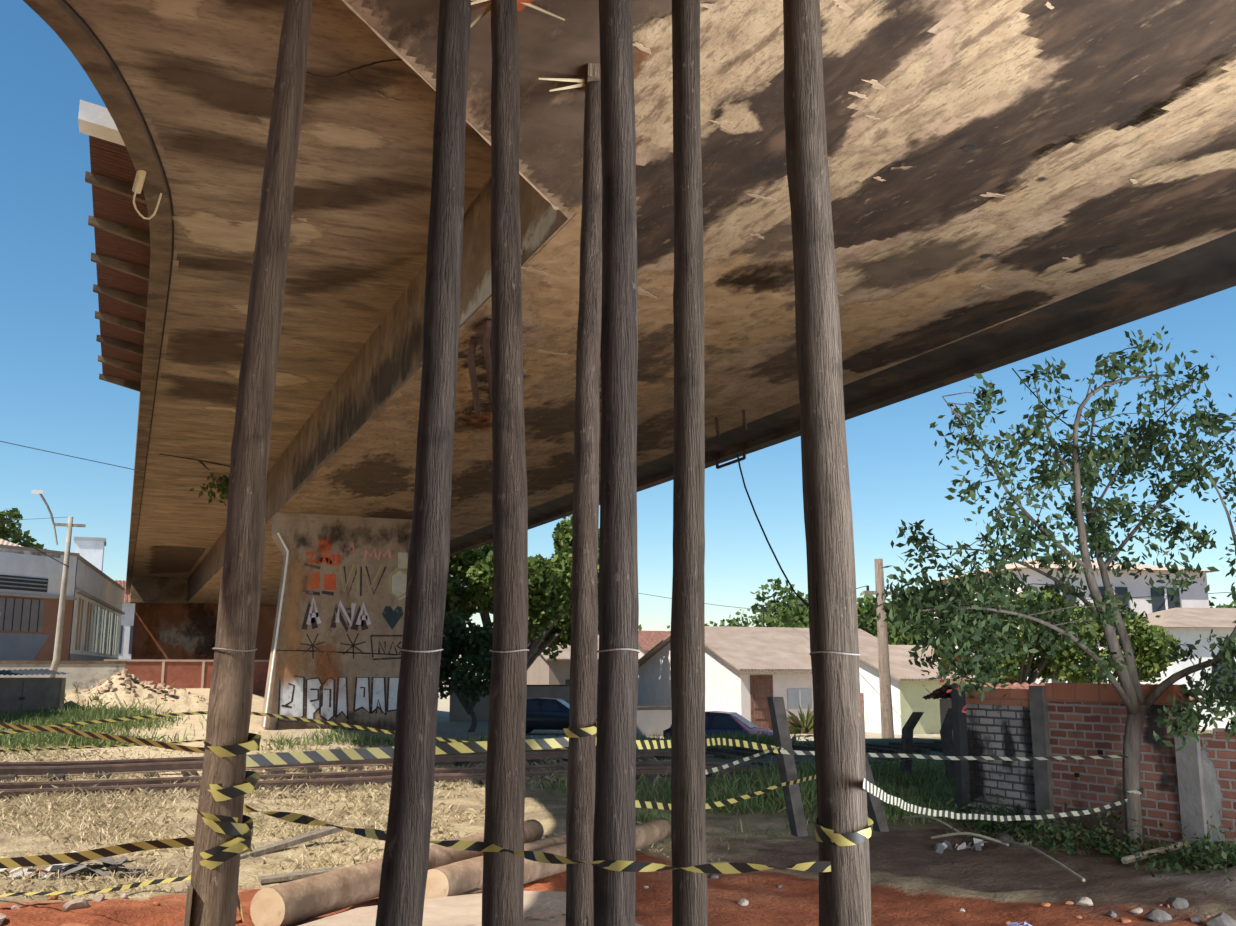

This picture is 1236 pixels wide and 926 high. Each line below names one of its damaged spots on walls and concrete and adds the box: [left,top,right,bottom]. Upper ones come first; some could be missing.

crack [306,59,402,75]
water stain [701,69,787,231]
water stain [820,0,1236,289]
water stain [636,152,674,269]
water stain [717,223,795,311]
water stain [293,287,423,544]
water stain [749,335,798,385]
water stain [842,291,1056,373]